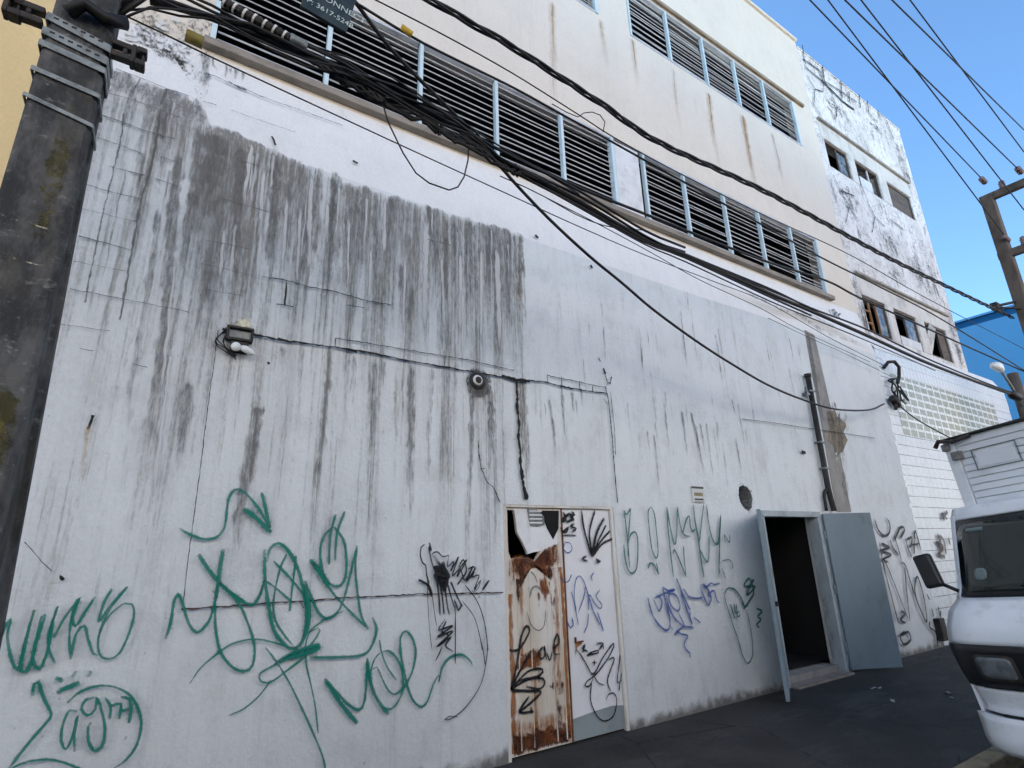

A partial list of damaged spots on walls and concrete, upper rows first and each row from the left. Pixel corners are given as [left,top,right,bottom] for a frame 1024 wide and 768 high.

leakage [62,68,525,494]
leakage [233,403,264,521]
crack [254,334,618,503]
peeling [804,330,851,512]
corrosion [508,545,581,755]